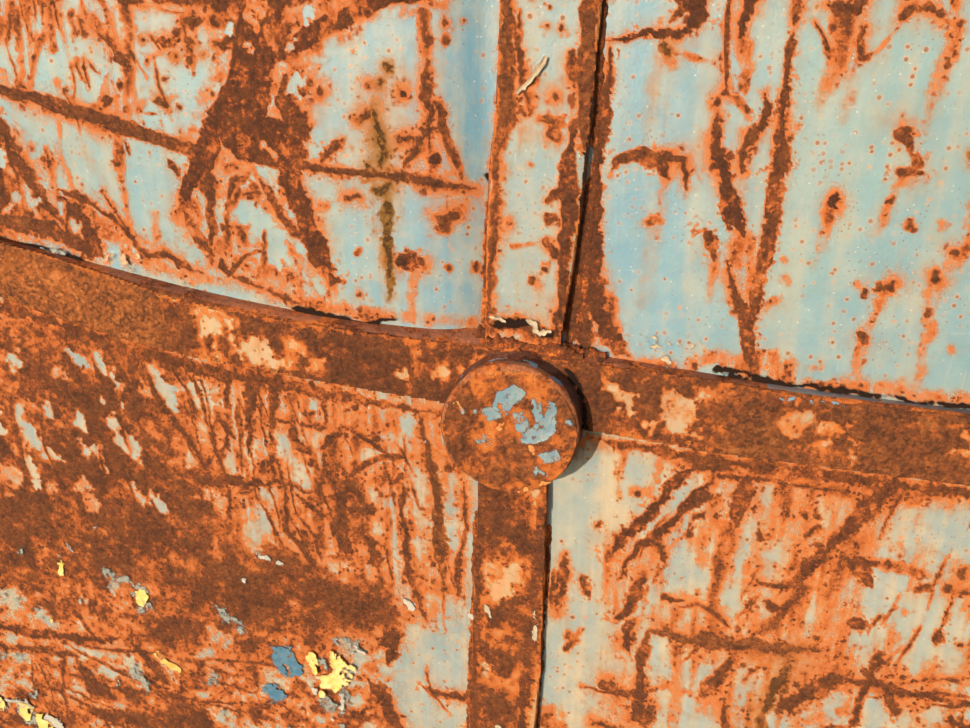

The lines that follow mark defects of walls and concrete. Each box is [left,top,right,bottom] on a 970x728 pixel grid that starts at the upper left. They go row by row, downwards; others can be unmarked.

rust [812,0,967,227]
rust [454,0,808,385]
rust [0,0,598,728]
rust [802,274,970,405]
rust [918,201,970,358]
peeling [0,690,64,728]
peeling [101,567,153,613]
peeling [115,661,150,692]
peeling [154,651,181,677]
peeling [215,604,246,635]
peeling [262,637,366,728]
rust [541,358,970,728]